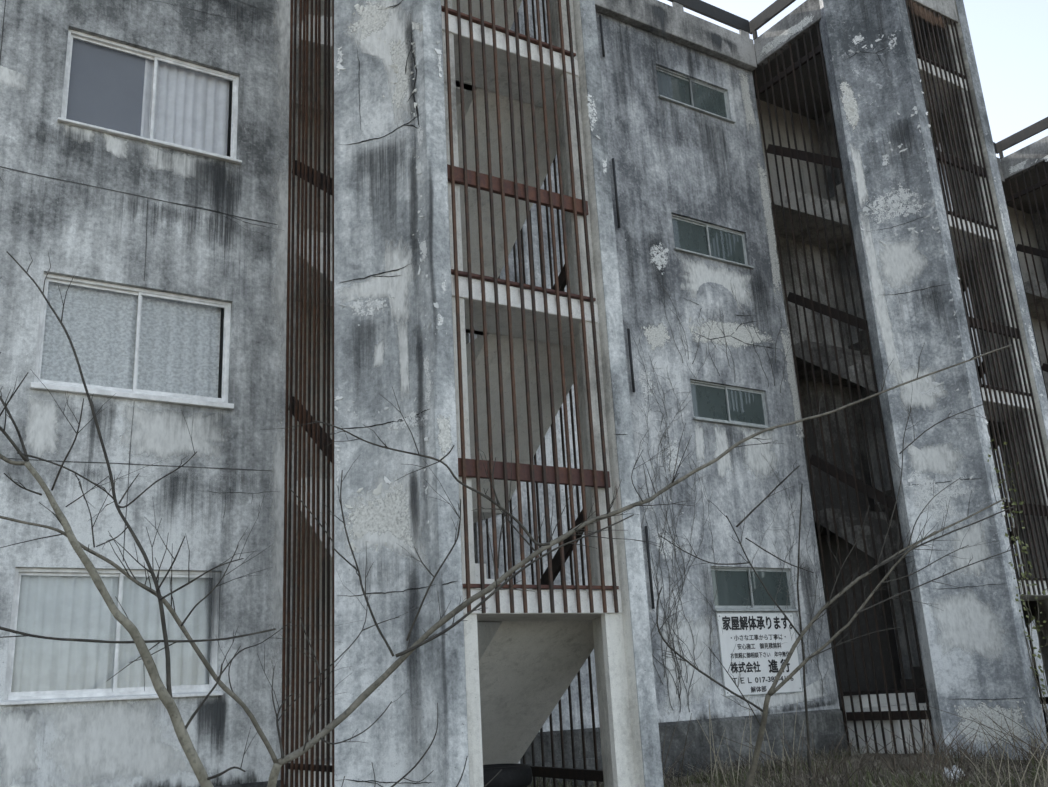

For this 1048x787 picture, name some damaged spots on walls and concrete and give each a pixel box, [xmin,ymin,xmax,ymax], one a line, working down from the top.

damp [708,32,735,51]
peeling [848,32,897,52]
damp [65,125,127,158]
crack [340,31,422,145]
peeling [348,1,425,218]
damp [148,146,240,232]
peeling [860,183,940,245]
crack [340,263,412,283]
peeling [413,230,447,340]
peeling [637,242,669,275]
damp [344,474,422,564]
damp [409,575,418,696]